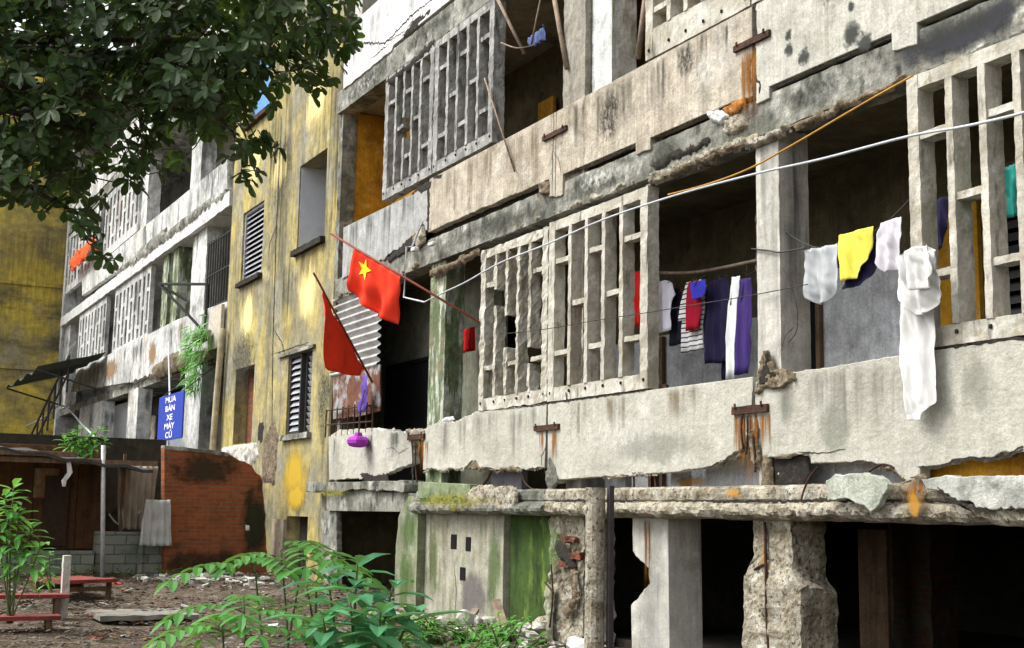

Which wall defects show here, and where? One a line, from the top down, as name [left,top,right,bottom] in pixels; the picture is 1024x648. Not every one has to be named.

water stain [844,2,871,51]
corrosion [742,50,756,107]
spalling [553,73,907,213]
spalling [221,419,279,486]
spalling [603,471,670,487]
corrosion [734,415,770,457]
spalling [705,415,818,501]
peeling [826,462,927,512]
corrosion [907,484,924,515]
spalling [544,536,586,642]
spalling [753,522,769,648]